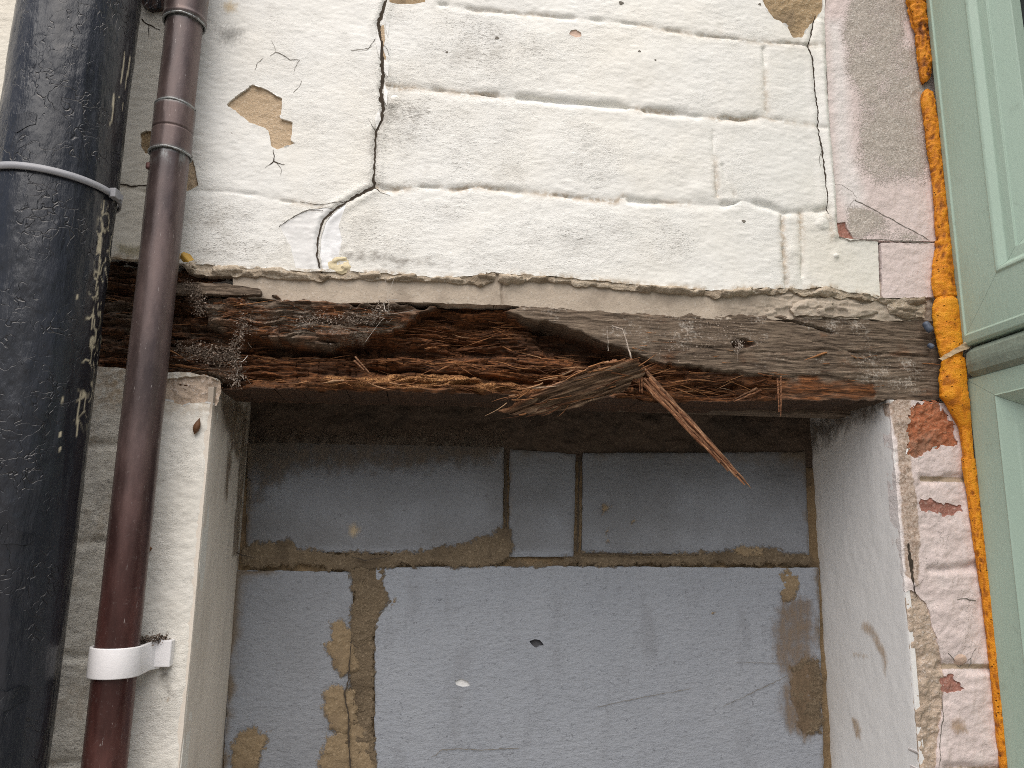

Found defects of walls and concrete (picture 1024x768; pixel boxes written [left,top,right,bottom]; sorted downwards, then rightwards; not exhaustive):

peeling [758,0,822,38]
peeling [228,85,294,149]
crack [279,0,390,268]
crack [807,16,930,243]
spalling [906,400,957,459]
spalling [919,498,962,517]
crack [907,543,923,599]
water stain [777,600,812,739]
peeling [905,590,963,768]